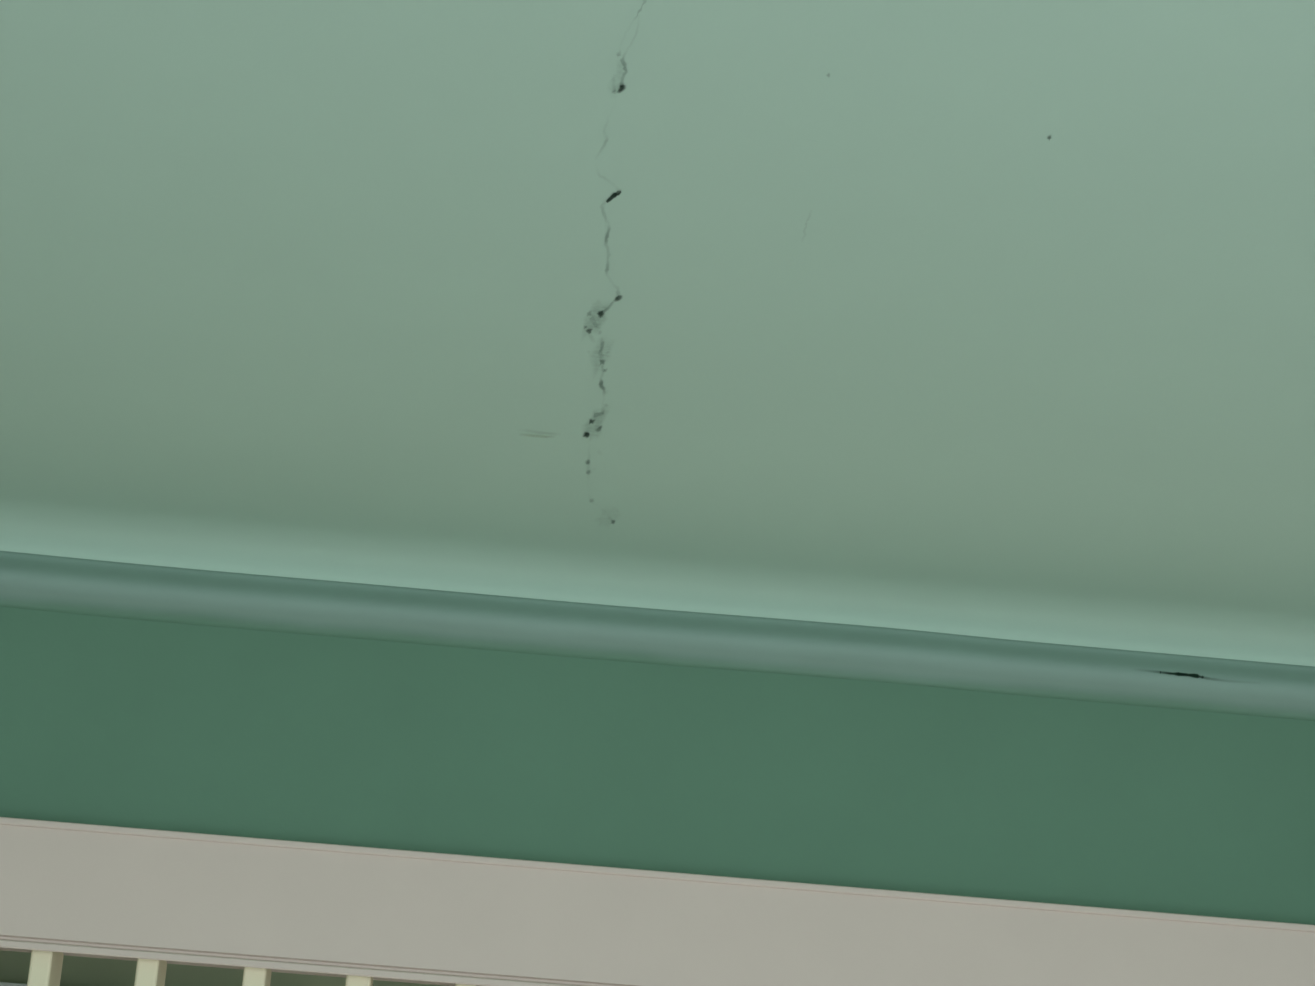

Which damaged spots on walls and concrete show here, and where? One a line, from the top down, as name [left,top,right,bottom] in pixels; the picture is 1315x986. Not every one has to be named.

crack [606,191,621,203]